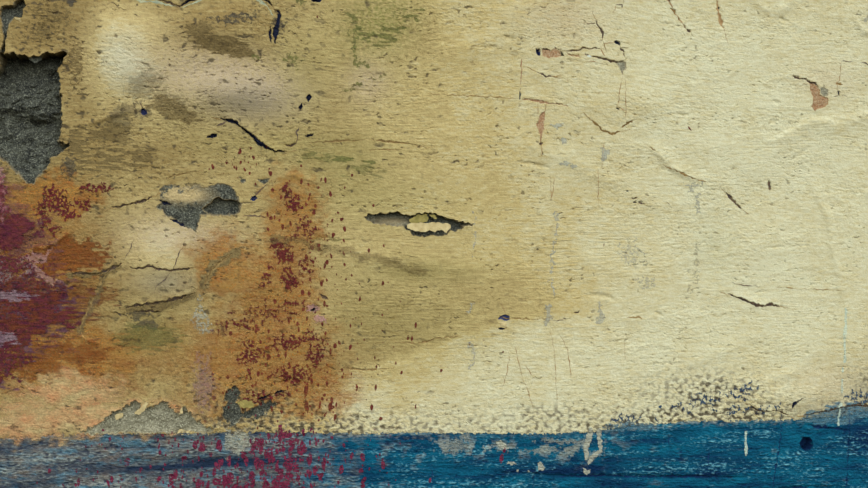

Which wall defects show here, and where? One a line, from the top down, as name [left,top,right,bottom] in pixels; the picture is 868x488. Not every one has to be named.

crack [256,0,281,44]
spalling [0,0,70,184]
crack [429,2,632,135]
spalling [792,76,829,111]
crack [212,117,430,152]
spalling [156,178,271,232]
spalling [365,211,473,237]
rust [0,168,144,446]
crack [72,240,206,343]
rust [191,170,352,418]
crack [719,283,842,308]
peeling [79,385,277,445]